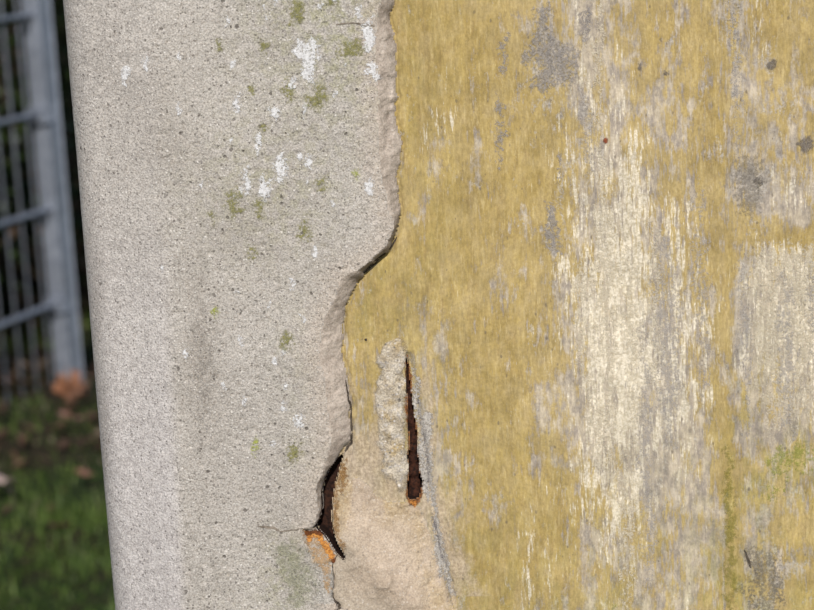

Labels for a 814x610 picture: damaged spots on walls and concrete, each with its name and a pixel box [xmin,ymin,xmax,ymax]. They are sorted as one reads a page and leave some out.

spalling [314,0,814,610]
corrosion [404,355,424,508]
corrosion [304,459,348,593]